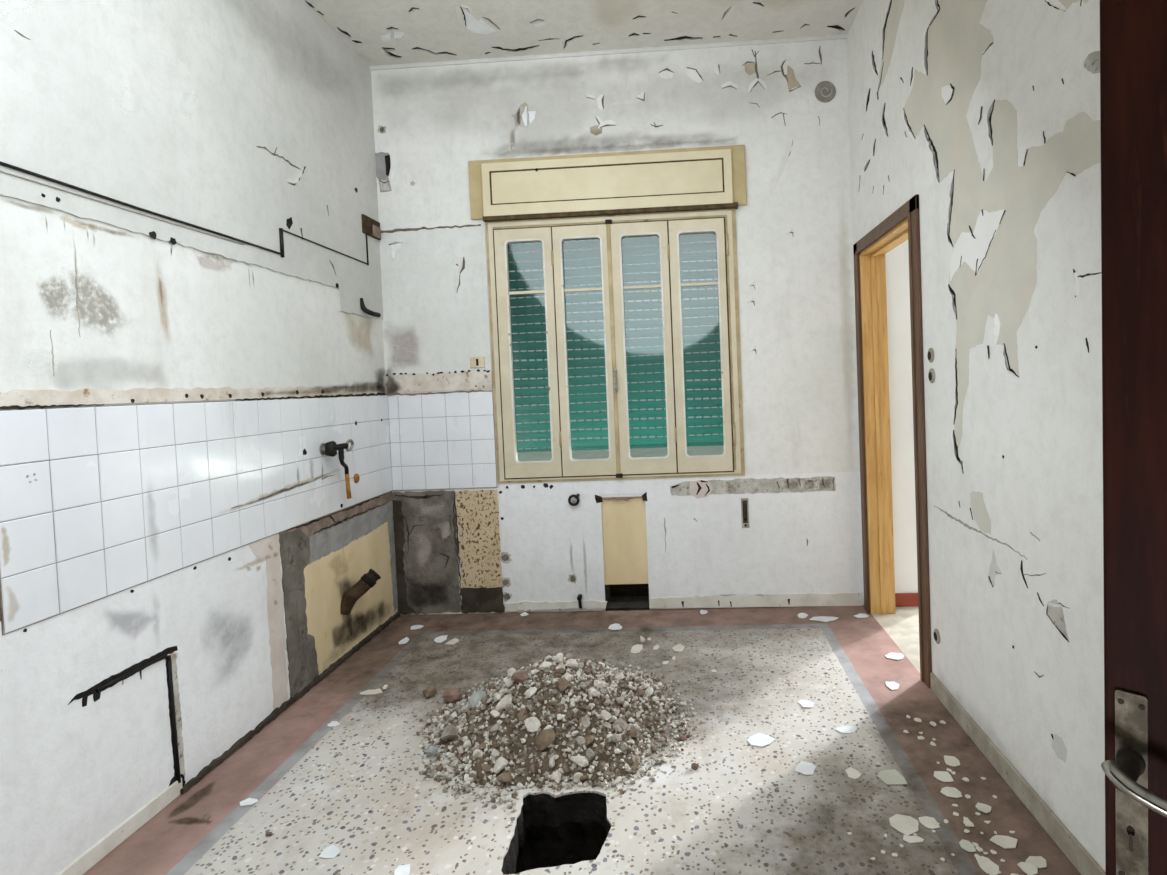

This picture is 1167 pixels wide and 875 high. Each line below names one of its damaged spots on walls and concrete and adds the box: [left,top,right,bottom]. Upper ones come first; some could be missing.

peeling [456,4,599,55]
peeling [664,34,737,42]
peeling [826,0,856,32]
peeling [877,0,905,93]
peeling [742,50,801,108]
peeling [517,102,536,127]
peeling [587,92,645,136]
crack [256,146,306,186]
peeling [903,0,1101,448]
peeling [970,491,991,535]
peeling [279,490,512,697]
peeling [1046,599,1070,642]